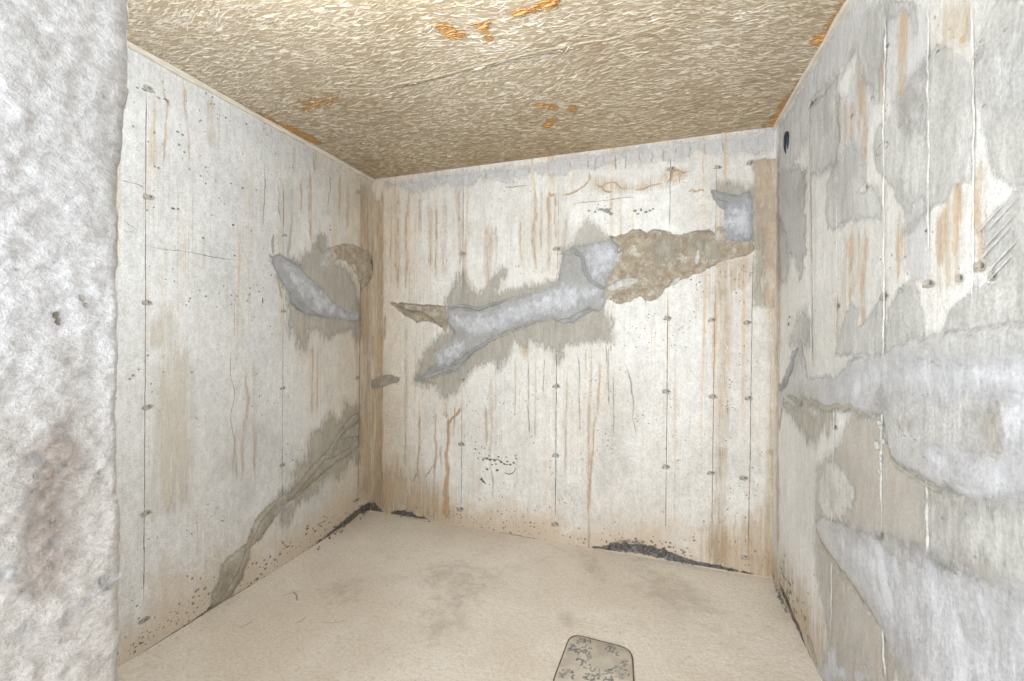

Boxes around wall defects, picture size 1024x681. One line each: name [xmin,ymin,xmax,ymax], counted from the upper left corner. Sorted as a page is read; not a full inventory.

spalling [320,243,373,290]
spalling [604,227,755,304]
leakage [211,404,362,606]
corrosion [415,409,460,516]
leakage [777,322,1024,681]